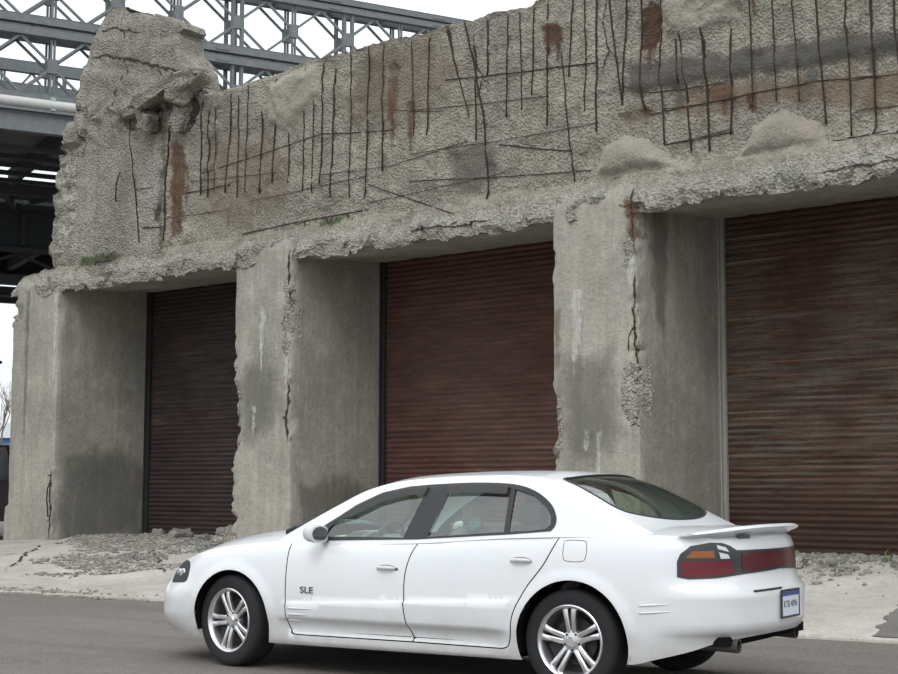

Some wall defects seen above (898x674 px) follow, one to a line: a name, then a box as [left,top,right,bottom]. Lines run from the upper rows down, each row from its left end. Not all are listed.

crack [91,27,180,105]
rust [542,23,562,60]
rust [643,3,661,63]
leakage [628,34,898,107]
spalling [639,0,898,151]
spalling [111,0,627,243]
rust [170,144,189,236]
crack [821,156,898,173]
crack [621,276,642,393]
crack [282,382,291,437]
spalling [621,361,654,427]
crack [5,474,52,569]